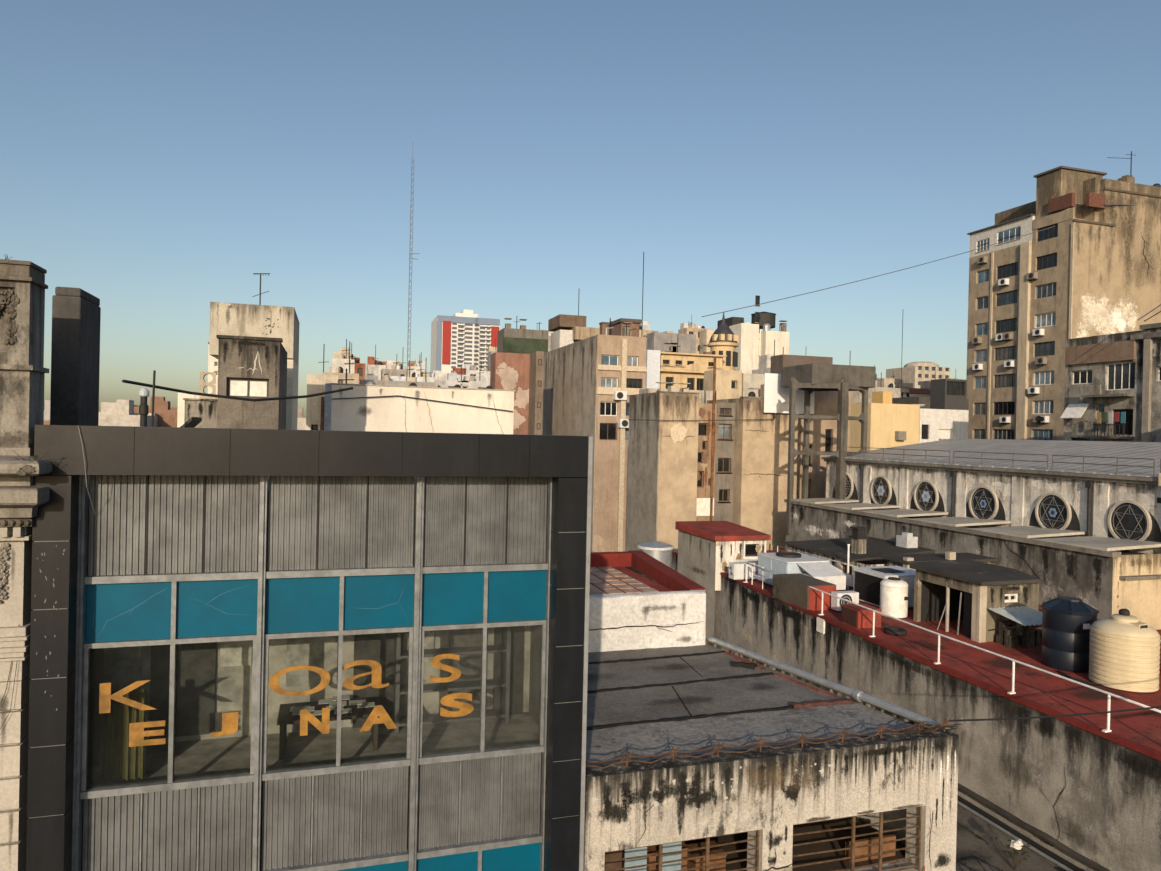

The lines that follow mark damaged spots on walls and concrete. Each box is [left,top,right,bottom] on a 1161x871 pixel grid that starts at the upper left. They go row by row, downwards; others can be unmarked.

flaking render [1065,296,1138,365]
leakage [223,341,278,384]
peeling [495,361,529,430]
leakage [730,582,846,682]
leakage [859,640,931,688]
leakage [1019,708,1080,761]
leakage [599,767,731,834]
leakage [759,764,800,802]
leakage [825,742,956,826]
leakage [1119,750,1161,789]
leakage [768,826,788,865]